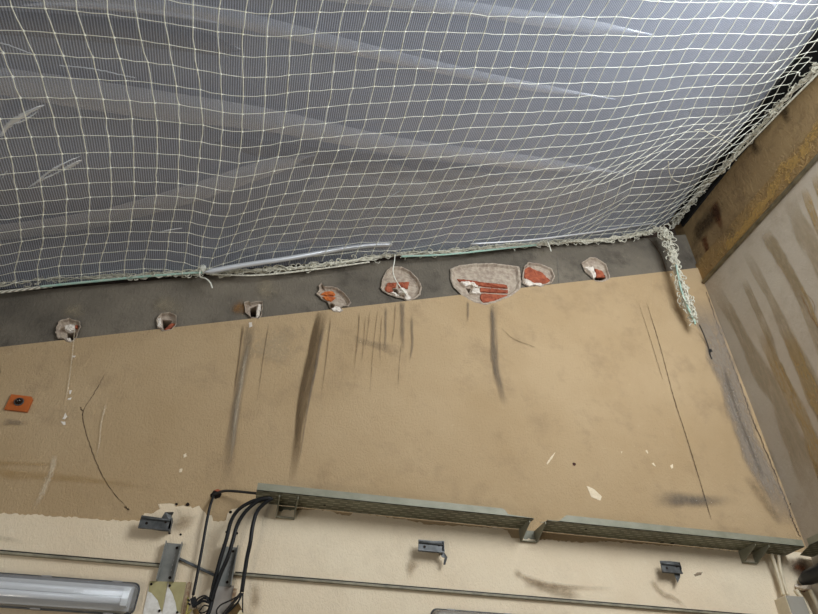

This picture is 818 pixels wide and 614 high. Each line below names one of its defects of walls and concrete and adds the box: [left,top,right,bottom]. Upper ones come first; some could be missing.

flaking render [55,318,81,343]
flaking render [156,312,177,332]
flaking render [244,301,263,328]
flaking render [316,283,351,313]
flaking render [380,266,422,301]
flaking render [450,262,555,305]
flaking render [581,257,610,282]
water stain [491,315,501,386]
water stain [295,323,330,449]
water stain [697,319,784,498]
crack [80,374,129,510]